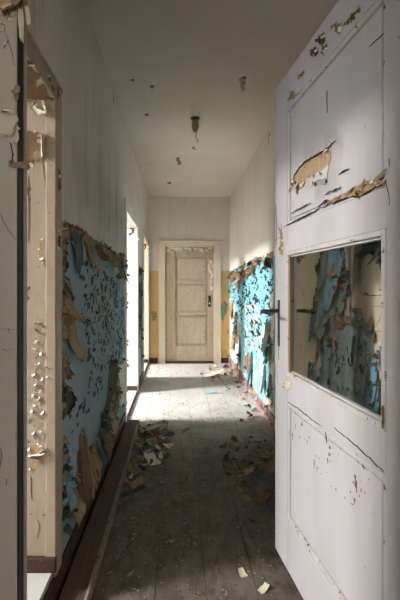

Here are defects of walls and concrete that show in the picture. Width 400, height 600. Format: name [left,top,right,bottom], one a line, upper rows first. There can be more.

peeling [0,0,31,43]
peeling [310,5,361,57]
peeling [11,60,61,115]
peeling [0,109,20,143]
peeling [27,130,43,167]
peeling [288,149,331,192]
peeling [329,178,380,205]
peeling [199,227,284,424]
peeling [297,240,385,429]
peeling [57,220,130,537]
crack [288,402,384,472]